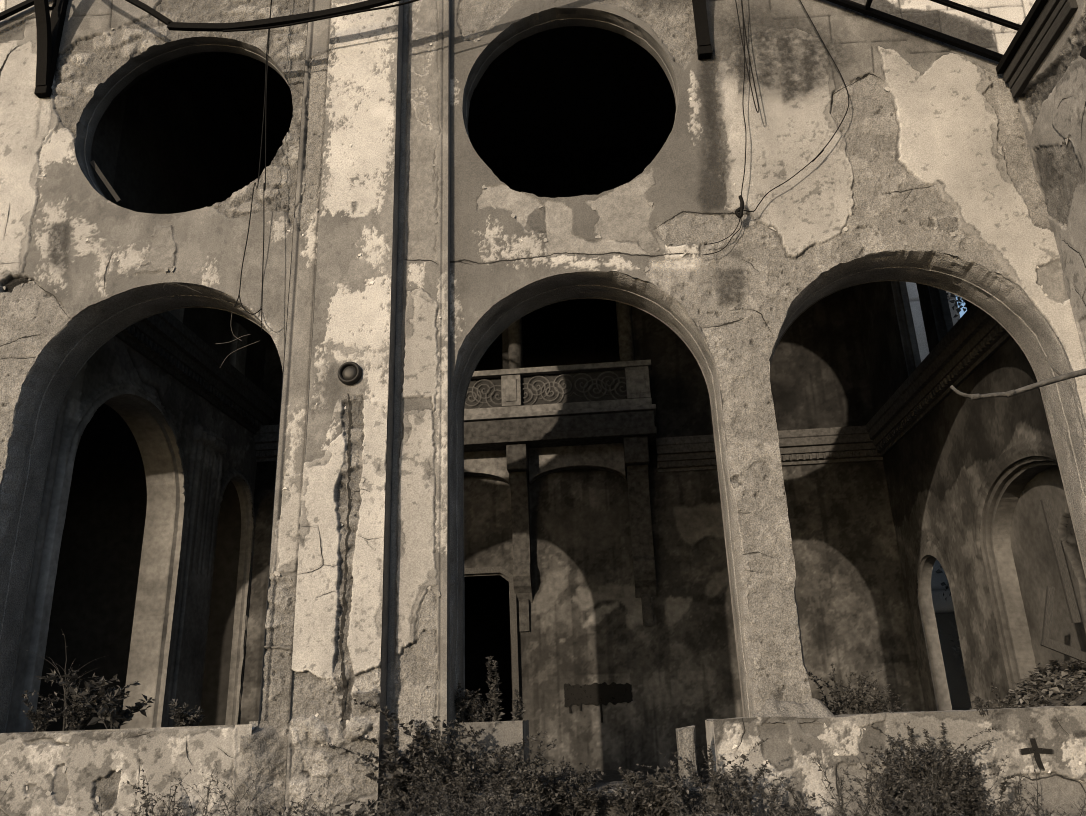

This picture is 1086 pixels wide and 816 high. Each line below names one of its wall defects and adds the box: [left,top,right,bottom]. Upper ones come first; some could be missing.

spalling [971,7,1086,227]
crack [656,211,747,229]
spalling [0,0,464,555]
crack [406,252,690,265]
spalling [472,74,1008,816]
crack [297,394,384,721]
spalling [25,737,72,746]
spalling [21,763,69,806]
spalling [93,767,121,812]